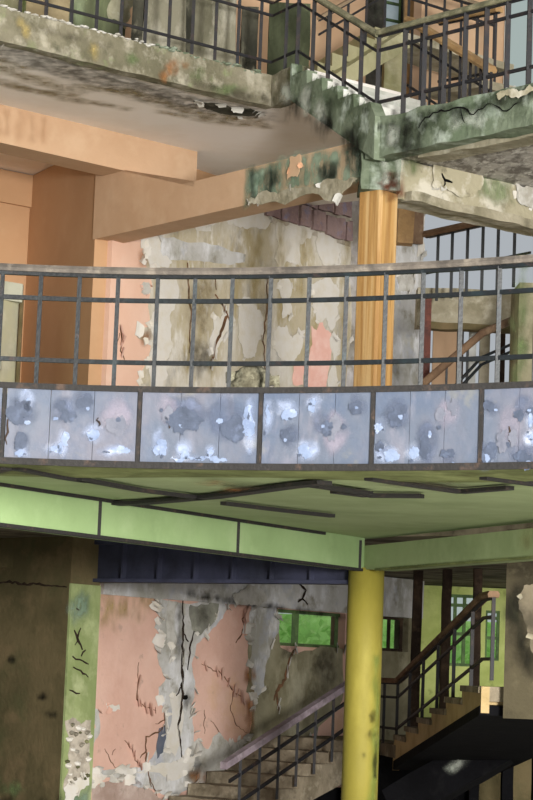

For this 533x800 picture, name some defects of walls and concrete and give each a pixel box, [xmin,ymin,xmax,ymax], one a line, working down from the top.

leakage [0,50,215,118]
crack [418,102,518,128]
peeling [139,154,357,268]
peeling [432,164,484,197]
peeling [135,277,354,387]
peeling [153,398,270,463]
crack [0,580,67,588]
crack [69,608,89,694]
crack [235,606,251,643]
peeling [517,584,533,653]
crack [105,601,247,796]
peeling [63,585,346,800]